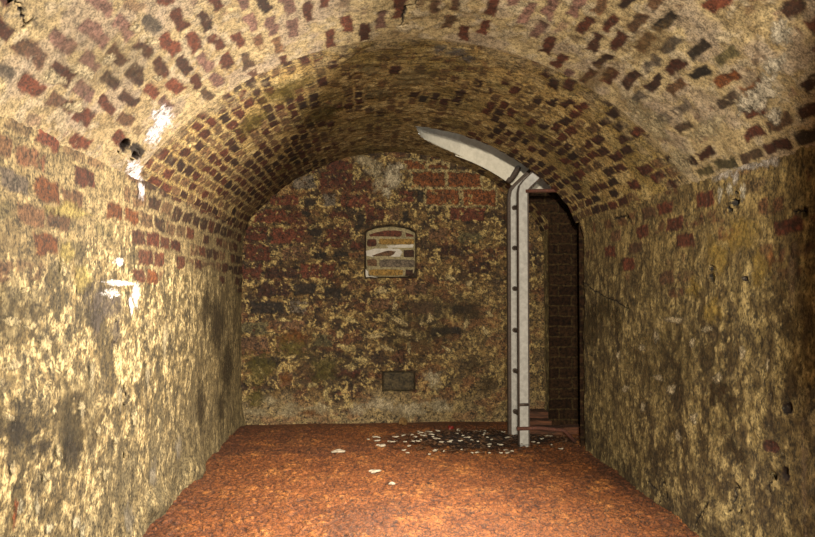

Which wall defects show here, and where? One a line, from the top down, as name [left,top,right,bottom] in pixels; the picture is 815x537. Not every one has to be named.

crack [394,0,426,25]
water stain [146,105,173,143]
water stain [126,160,145,196]
water stain [76,266,140,341]